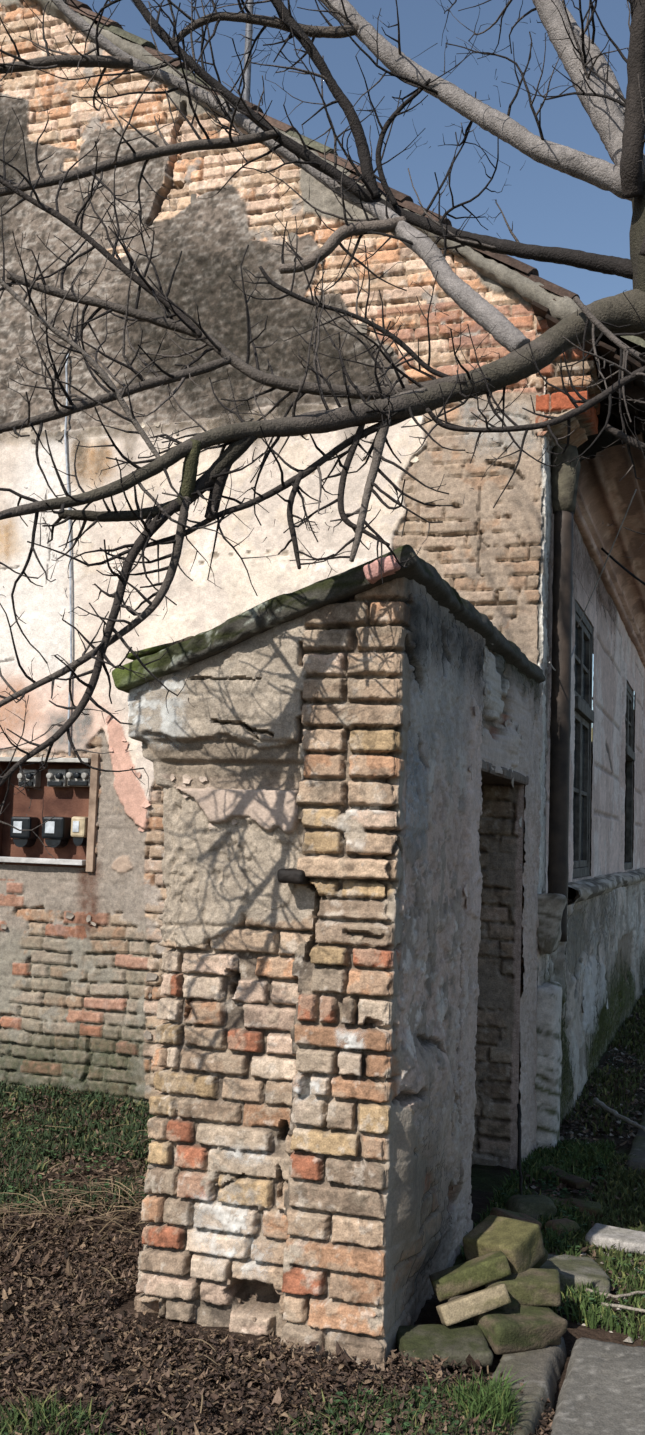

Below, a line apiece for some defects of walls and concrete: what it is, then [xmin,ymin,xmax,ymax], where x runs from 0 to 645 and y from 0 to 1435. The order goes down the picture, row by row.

flaking render [0,0,511,384]
flaking render [437,246,545,341]
spalling [106,715,302,833]
crack [187,675,262,683]
crack [208,718,275,742]
flaking render [399,374,546,918]
flaking render [112,856,133,873]
flaking render [0,912,157,1105]